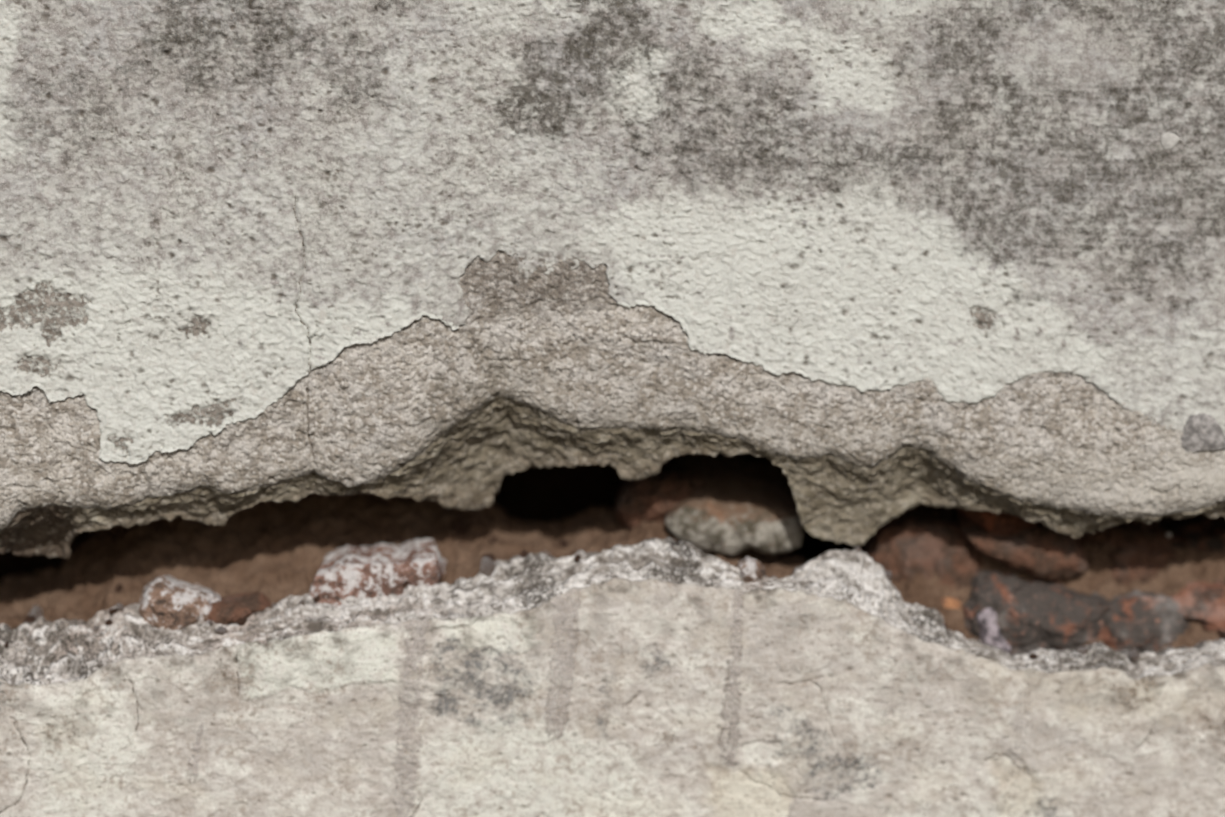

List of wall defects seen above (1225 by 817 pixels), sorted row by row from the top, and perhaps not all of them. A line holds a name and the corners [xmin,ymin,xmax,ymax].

water stain [138,0,314,92]
water stain [496,0,732,190]
water stain [719,82,817,183]
water stain [802,0,1225,296]
spalling [0,251,1225,530]
crack [0,192,1225,737]
flaking render [962,570,1225,655]